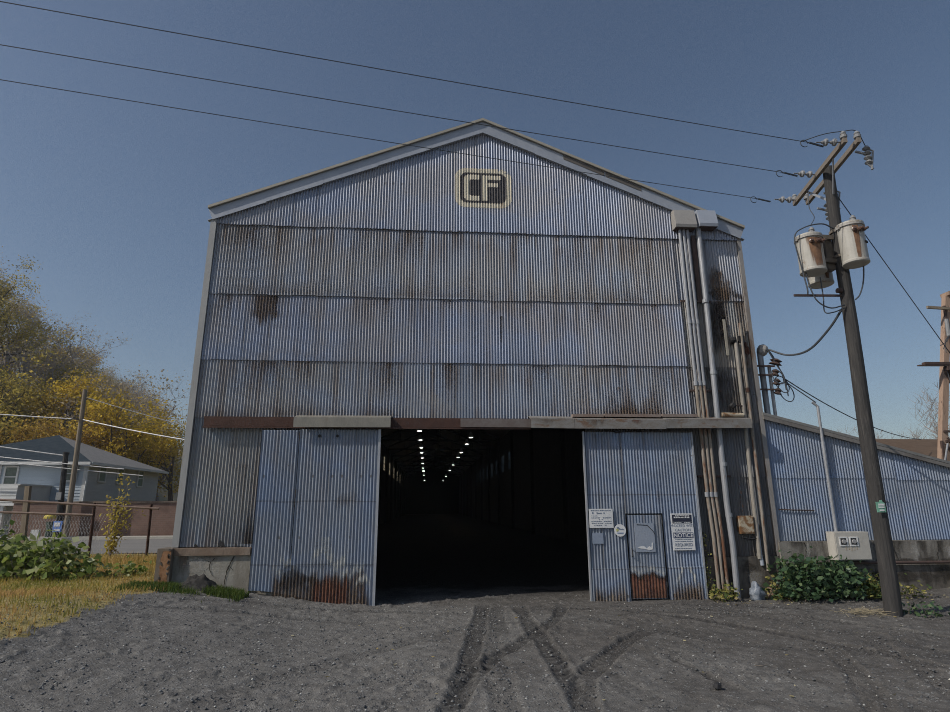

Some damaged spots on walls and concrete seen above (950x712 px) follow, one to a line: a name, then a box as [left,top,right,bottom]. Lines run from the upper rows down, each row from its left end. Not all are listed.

rust [256,295,277,323]
crack [203,556,235,586]
rust [312,552,367,605]
rust [596,567,702,602]